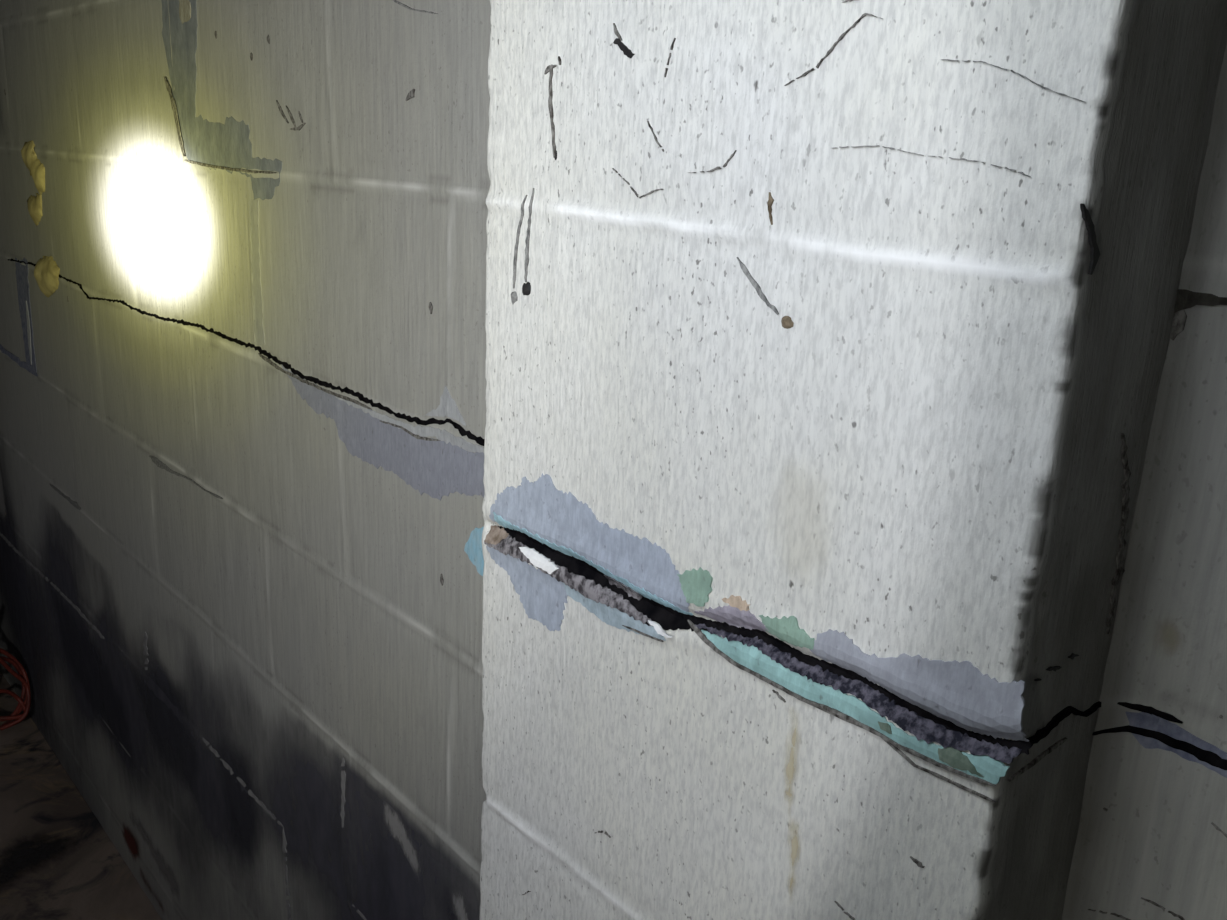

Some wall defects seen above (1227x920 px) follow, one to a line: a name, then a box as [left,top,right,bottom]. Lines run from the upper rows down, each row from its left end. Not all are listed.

crack [664,38,676,77]
crack [784,0,883,86]
crack [941,59,1085,102]
peeling [161,0,282,345]
crack [612,168,664,198]
crack [647,121,664,152]
crack [688,150,737,173]
crack [834,145,1031,177]
crack [7,258,485,446]
peeling [281,365,1029,784]
water stain [0,478,480,920]
crack [484,525,1227,803]